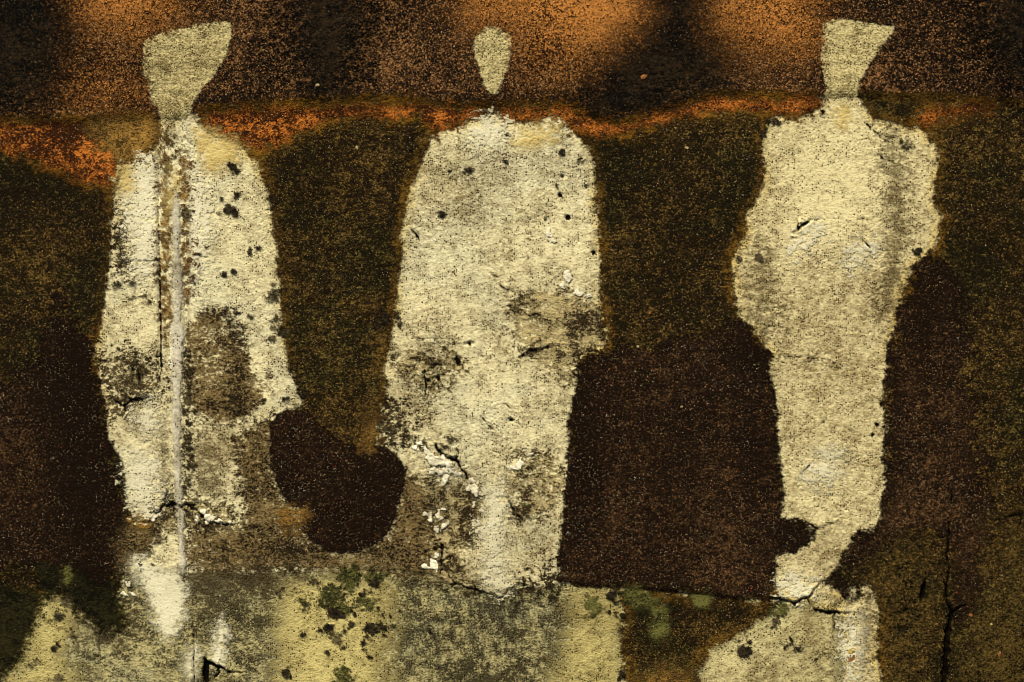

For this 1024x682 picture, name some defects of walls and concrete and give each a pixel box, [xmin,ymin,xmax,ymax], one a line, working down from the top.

rust [909,89,1001,133]
crack [414,437,468,479]
flaking render [411,440,487,599]
crack [192,627,240,682]
water stain [267,571,408,682]
crack [778,580,845,648]
crack [889,495,964,682]